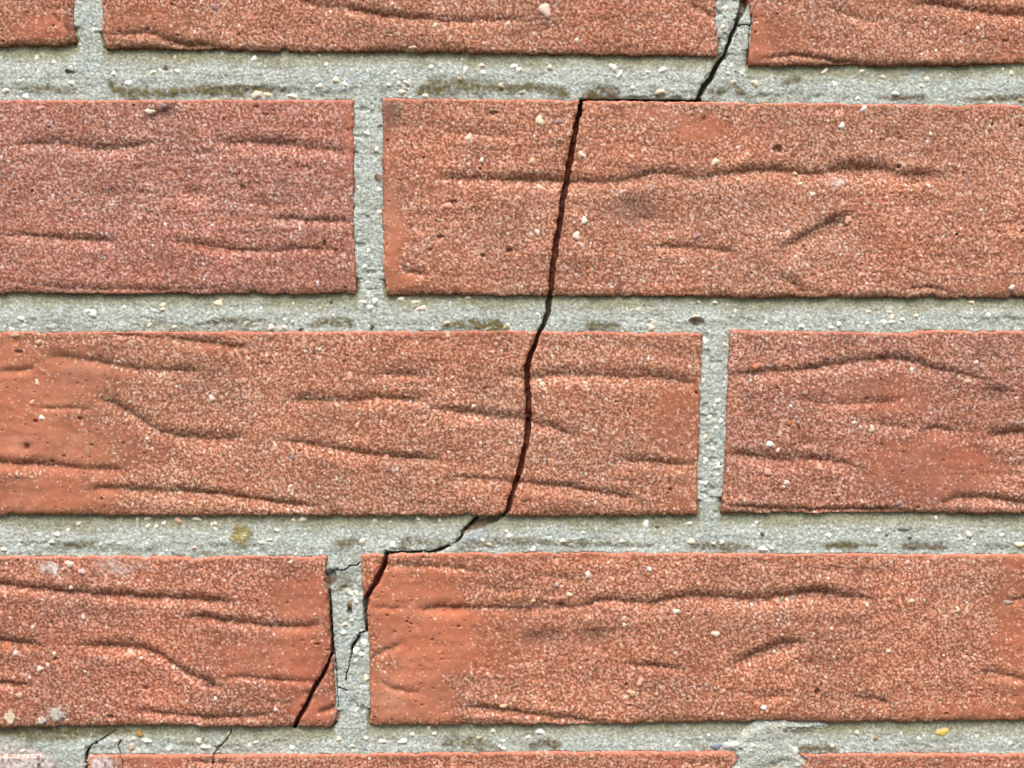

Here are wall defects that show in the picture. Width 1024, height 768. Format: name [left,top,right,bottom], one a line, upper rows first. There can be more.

crack [293,0,752,727]